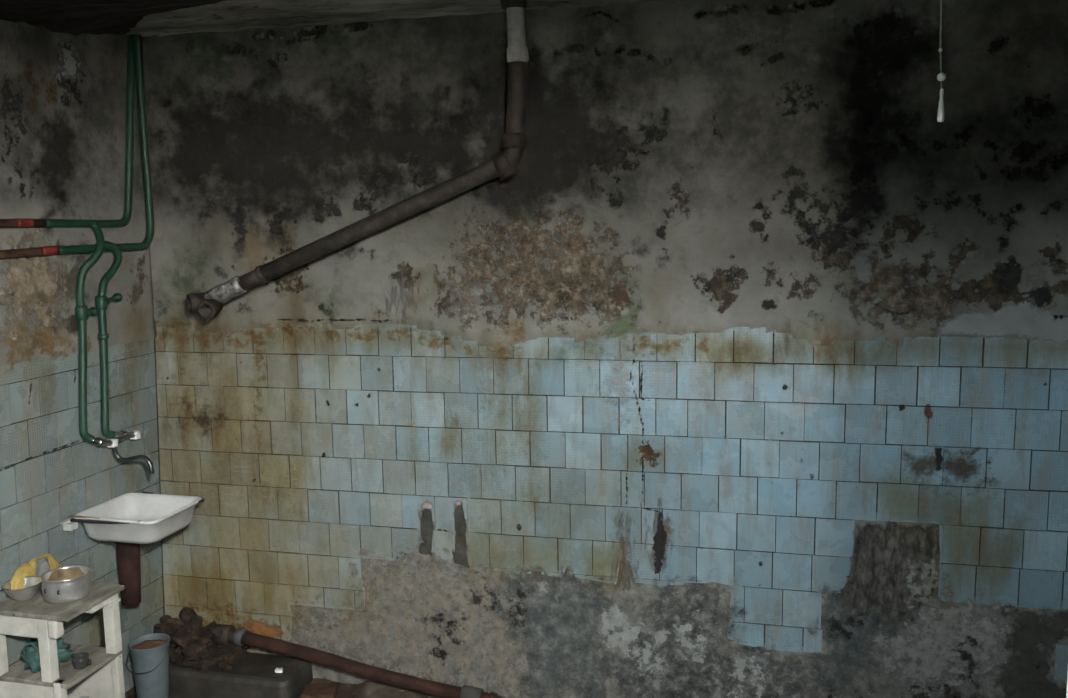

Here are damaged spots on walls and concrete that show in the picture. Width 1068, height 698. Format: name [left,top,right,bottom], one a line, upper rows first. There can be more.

water stain [161,63,508,252]
water stain [279,262,420,322]
flaking render [434,210,642,334]
water stain [471,43,669,223]
mould [656,183,690,253]
peeling [691,266,748,313]
mould [748,7,974,310]
flaking render [834,213,1068,342]
corrosion [637,441,660,467]
crack [626,348,672,574]
spalling [242,646,287,673]
spalling [281,495,1068,698]